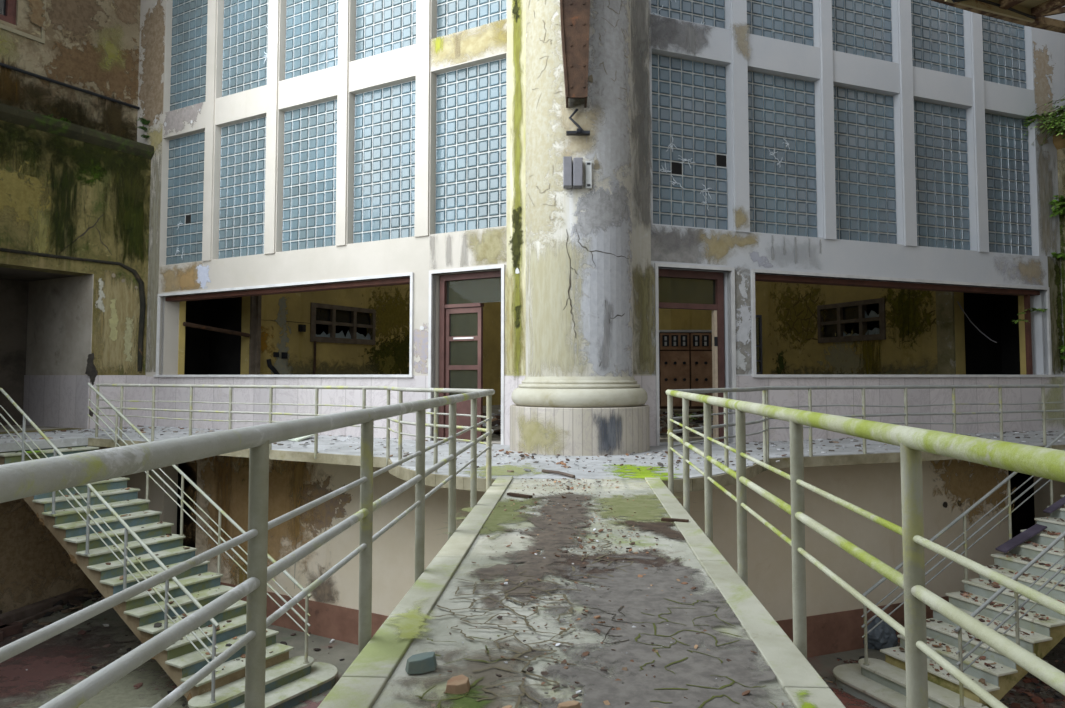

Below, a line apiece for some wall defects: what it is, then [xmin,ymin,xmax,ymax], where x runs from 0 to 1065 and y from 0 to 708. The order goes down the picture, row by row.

peeling [27,0,203,137]
peeling [734,25,750,57]
damp [32,211,52,254]
peeling [196,265,211,289]
crack [528,175,628,338]
damp [430,0,758,377]
peeling [735,251,773,374]
damp [594,413,622,454]
damp [0,501,81,609]
crack [416,539,777,708]